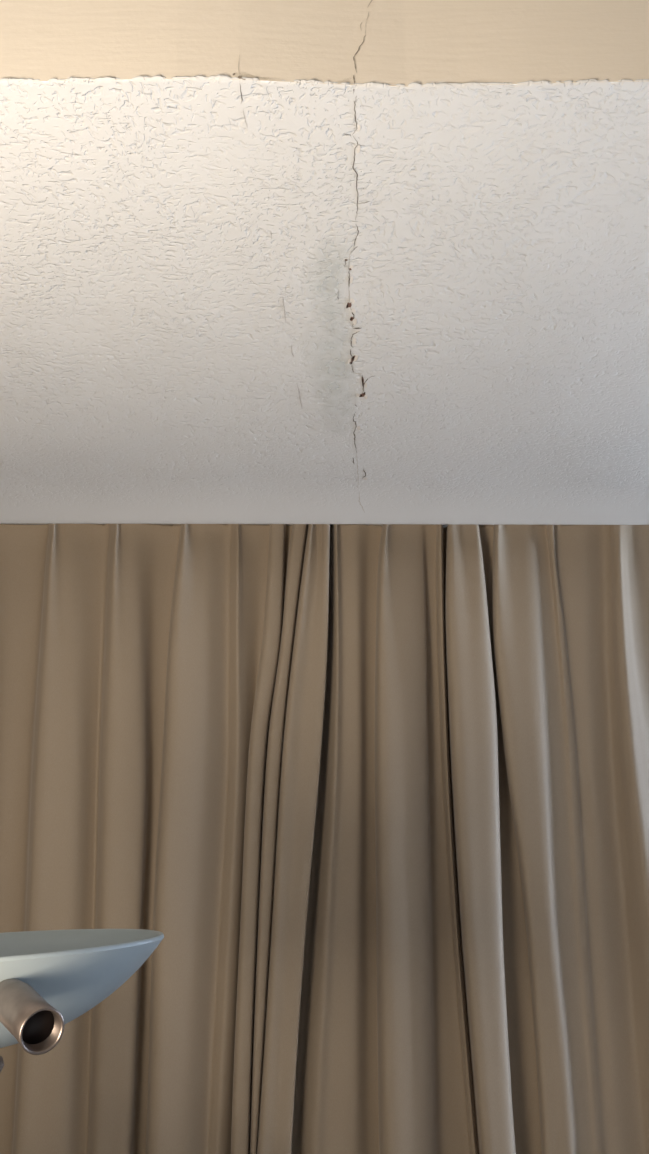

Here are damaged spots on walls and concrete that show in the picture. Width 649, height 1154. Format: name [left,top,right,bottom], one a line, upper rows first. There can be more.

crack [337,0,373,513]